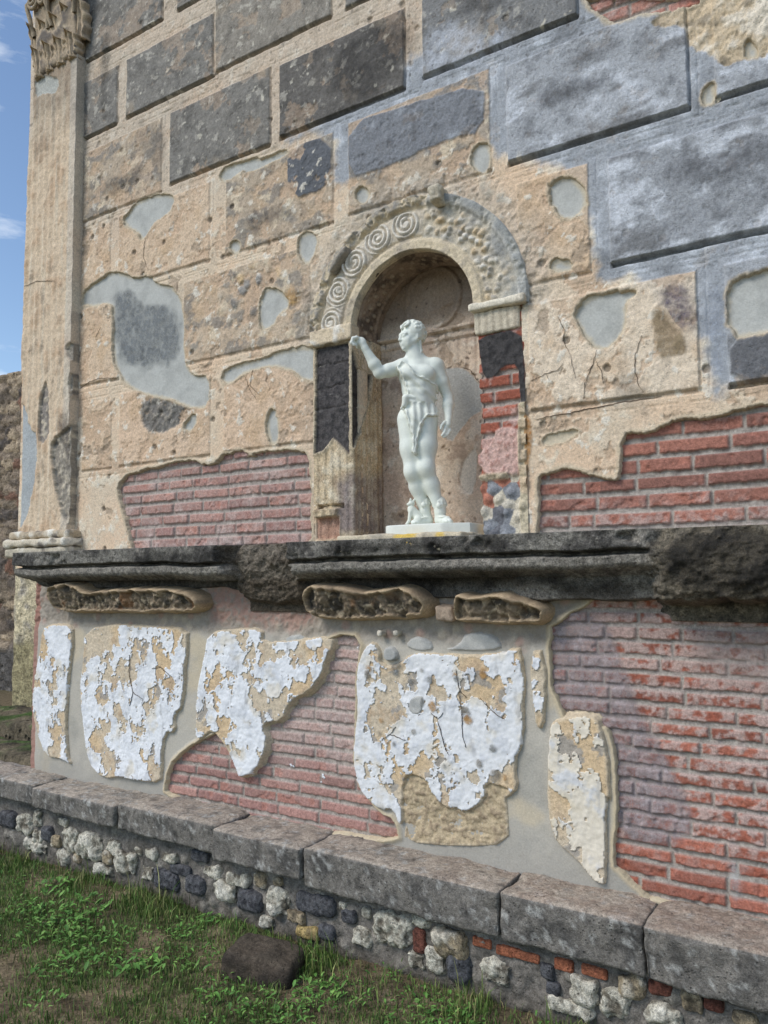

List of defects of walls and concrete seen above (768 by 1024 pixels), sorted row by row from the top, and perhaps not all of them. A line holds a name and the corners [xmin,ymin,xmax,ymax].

crack [535,316,657,420]
flaking render [121,450,312,548]
flaking render [539,406,768,532]
flaking render [32,600,768,920]